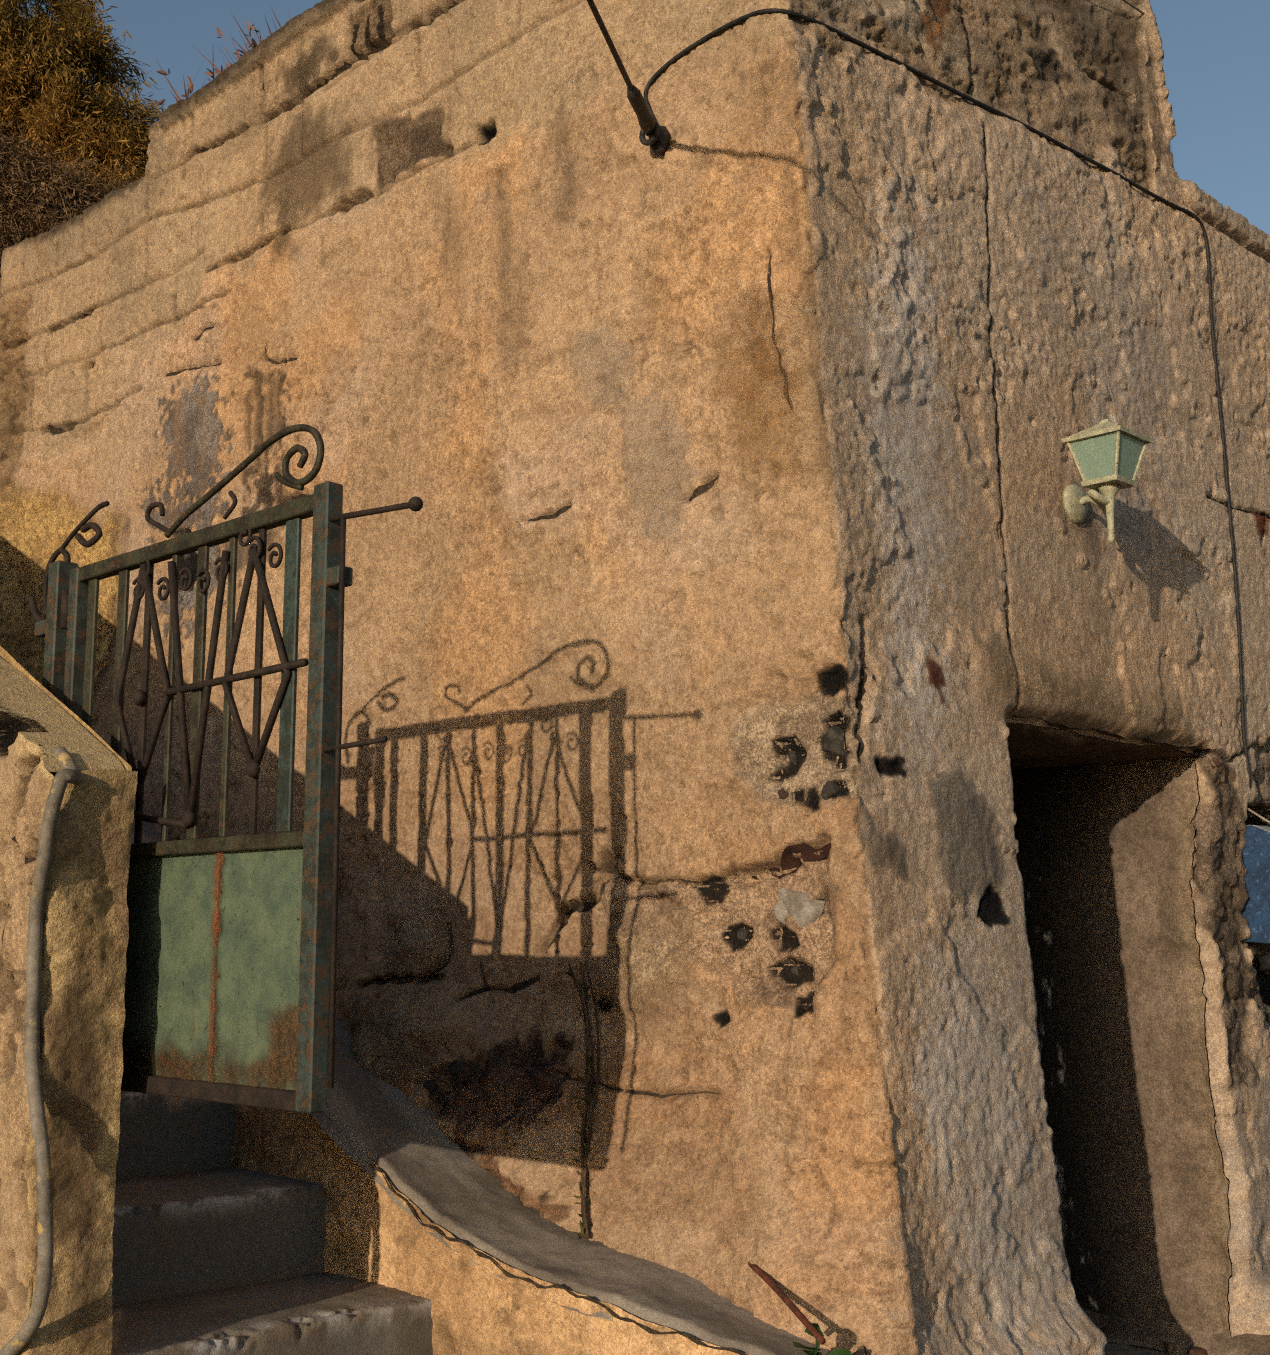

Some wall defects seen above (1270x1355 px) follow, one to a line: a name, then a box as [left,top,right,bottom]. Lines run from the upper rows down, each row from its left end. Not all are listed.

crack [958,0,969,49]
crack [767,249,792,410]
crack [967,81,1019,712]
spalling [730,692,862,804]
spalling [411,1030,573,1221]
crack [369,1163,746,1355]